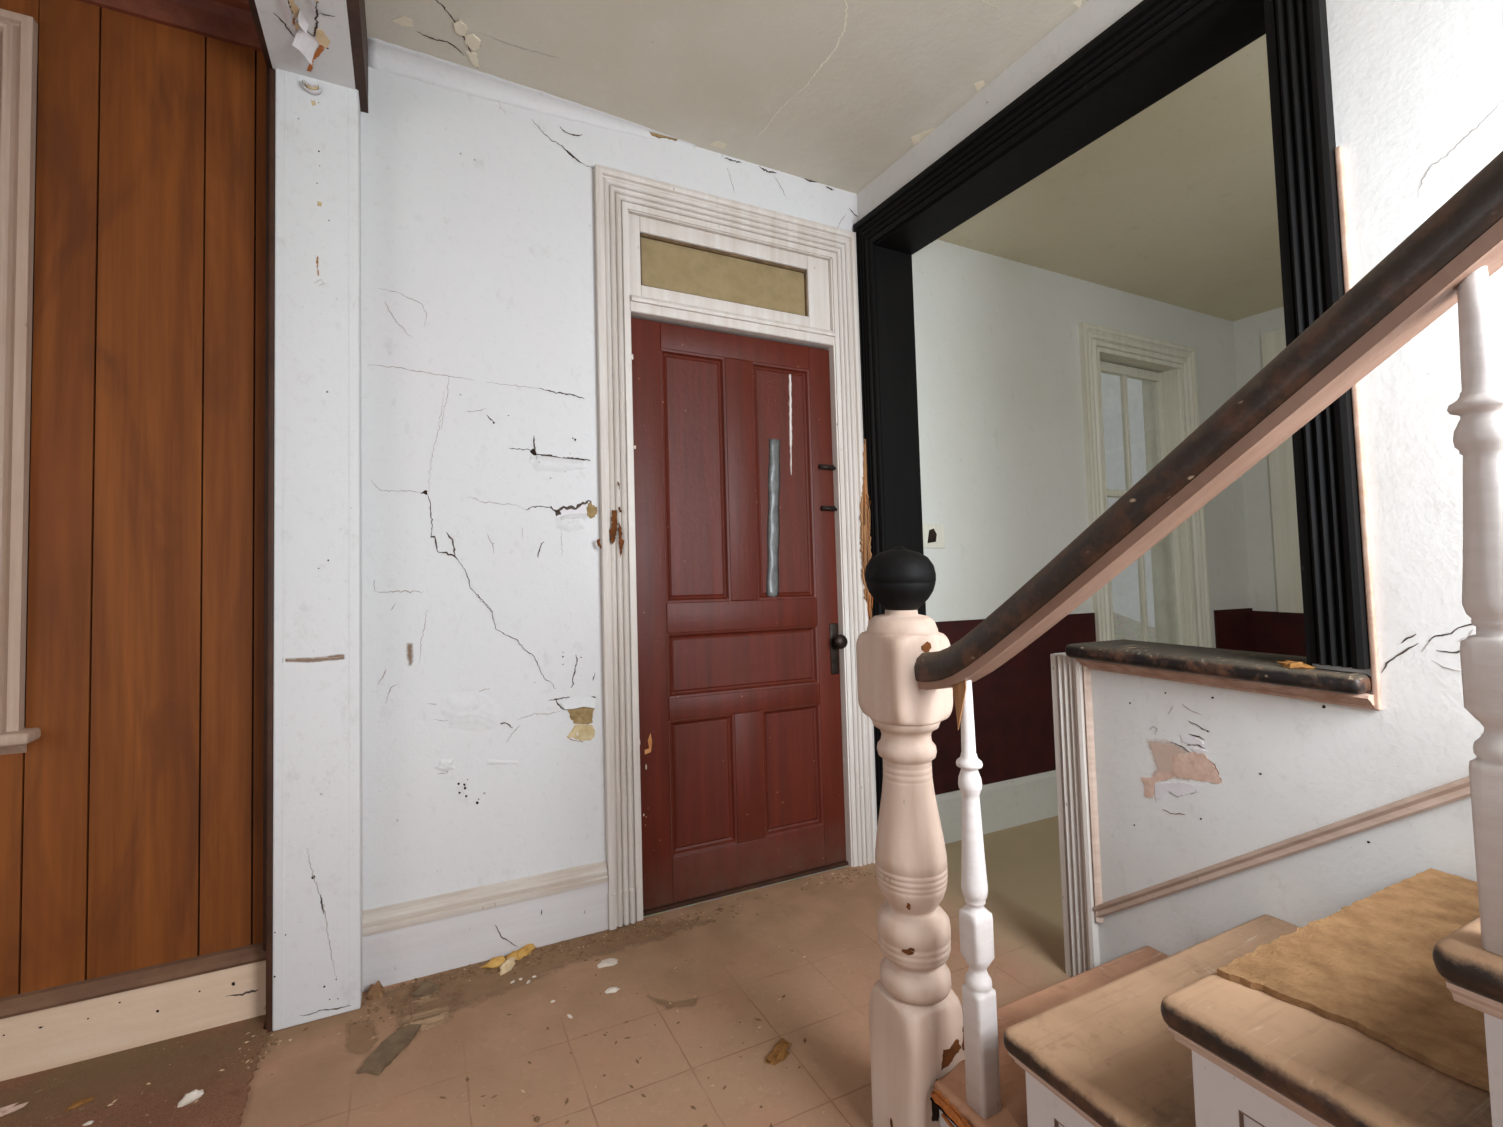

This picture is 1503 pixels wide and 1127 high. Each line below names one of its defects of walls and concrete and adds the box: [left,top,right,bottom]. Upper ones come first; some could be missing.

peeling [273,0,335,106]
crack [1418,101,1502,196]
crack [367,288,590,698]
flaking render [467,482,624,557]
flaking render [518,674,596,742]
flaking render [1141,692,1223,820]
crack [301,848,351,1016]
peeling [941,1028,964,1070]
peeling [930,1089,968,1127]